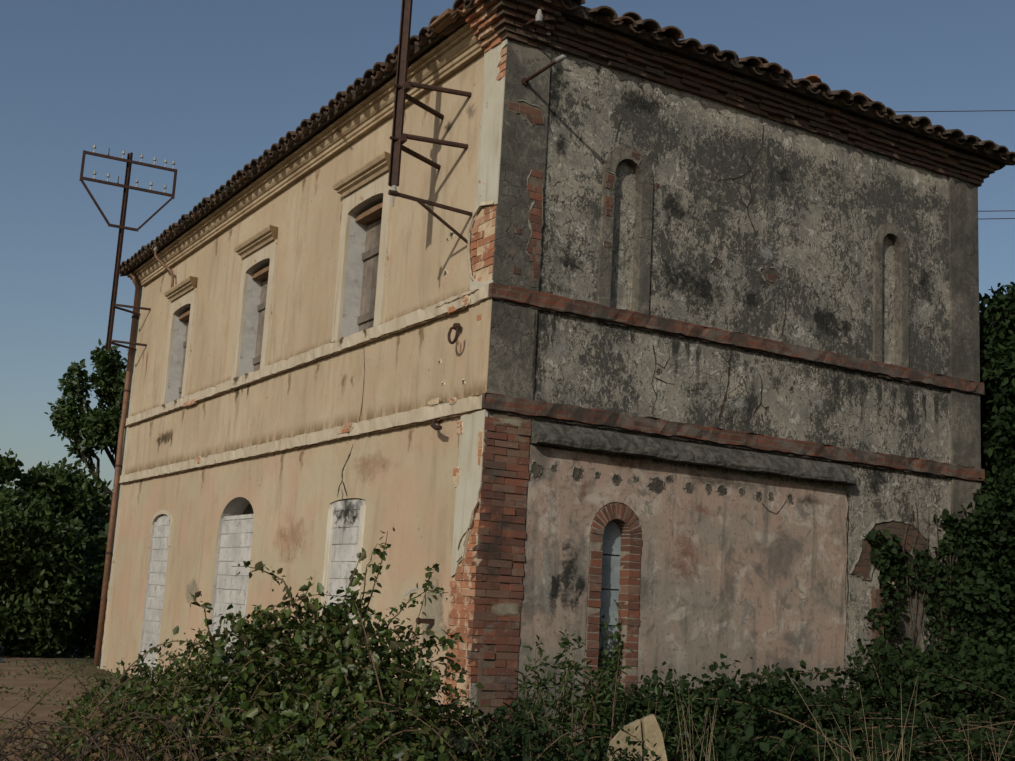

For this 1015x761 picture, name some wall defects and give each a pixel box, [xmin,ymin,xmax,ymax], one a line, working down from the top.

leakage [548,69,567,113]
spalling [467,200,496,282]
spalling [508,169,544,282]
leakage [560,250,582,269]
leakage [664,193,684,226]
leakage [666,263,722,302]
leakage [914,252,933,305]
leakage [814,307,852,337]
crack [651,345,674,411]
spalling [476,428,485,469]
spalling [849,518,935,581]
leakage [544,555,559,611]